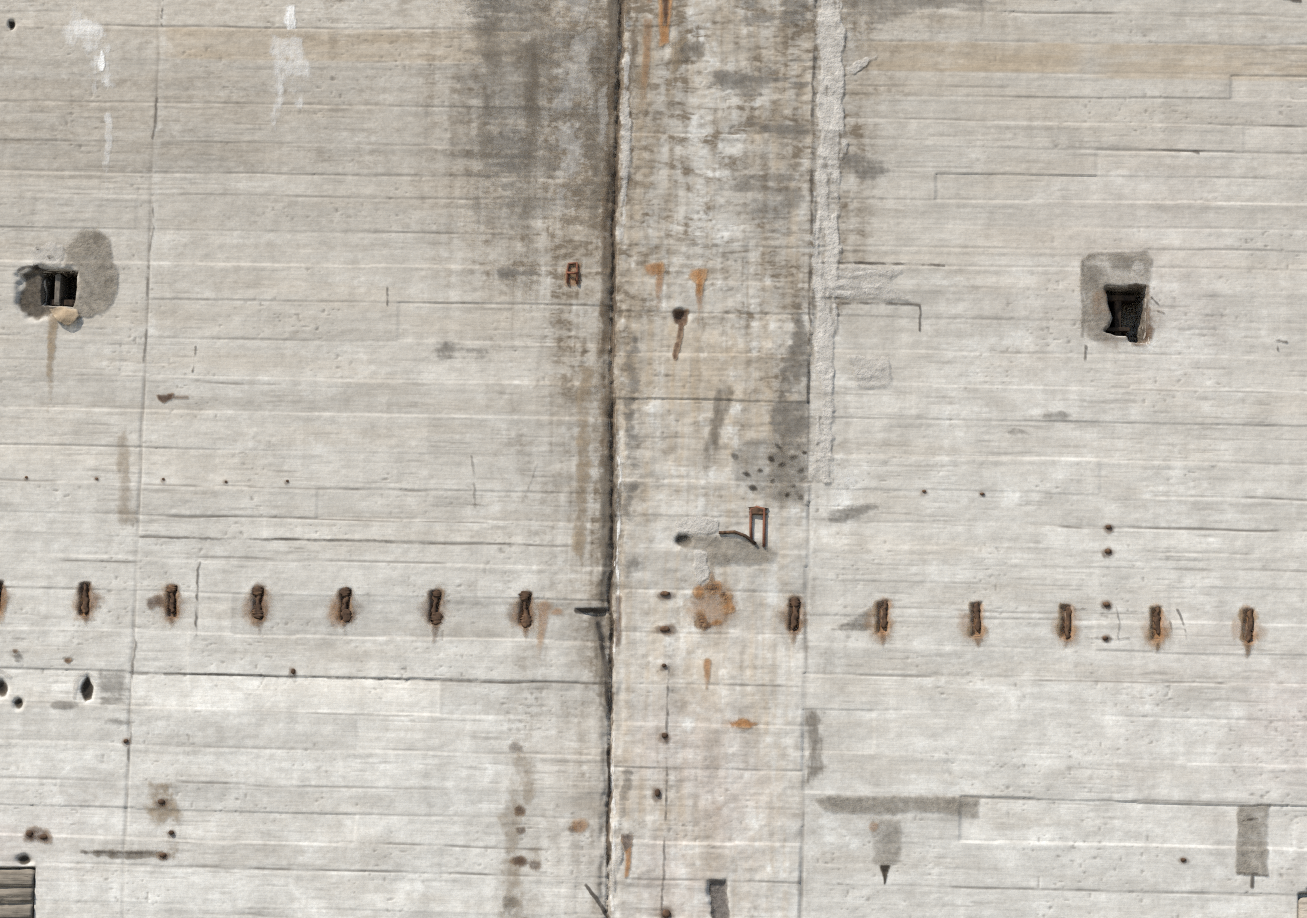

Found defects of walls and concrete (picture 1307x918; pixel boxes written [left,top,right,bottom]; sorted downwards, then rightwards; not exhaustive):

corrosion [642,0,672,69]
damp [668,41,703,93]
damp [714,71,808,96]
spalling [18,242,80,326]
damp [769,313,808,447]
crack [574,0,625,918]
corrosion [76,581,92,620]
corrosion [147,584,179,620]
corrosion [332,590,355,622]
corrosion [427,588,444,628]
corrosion [693,573,735,630]
corrosion [1239,606,1258,655]